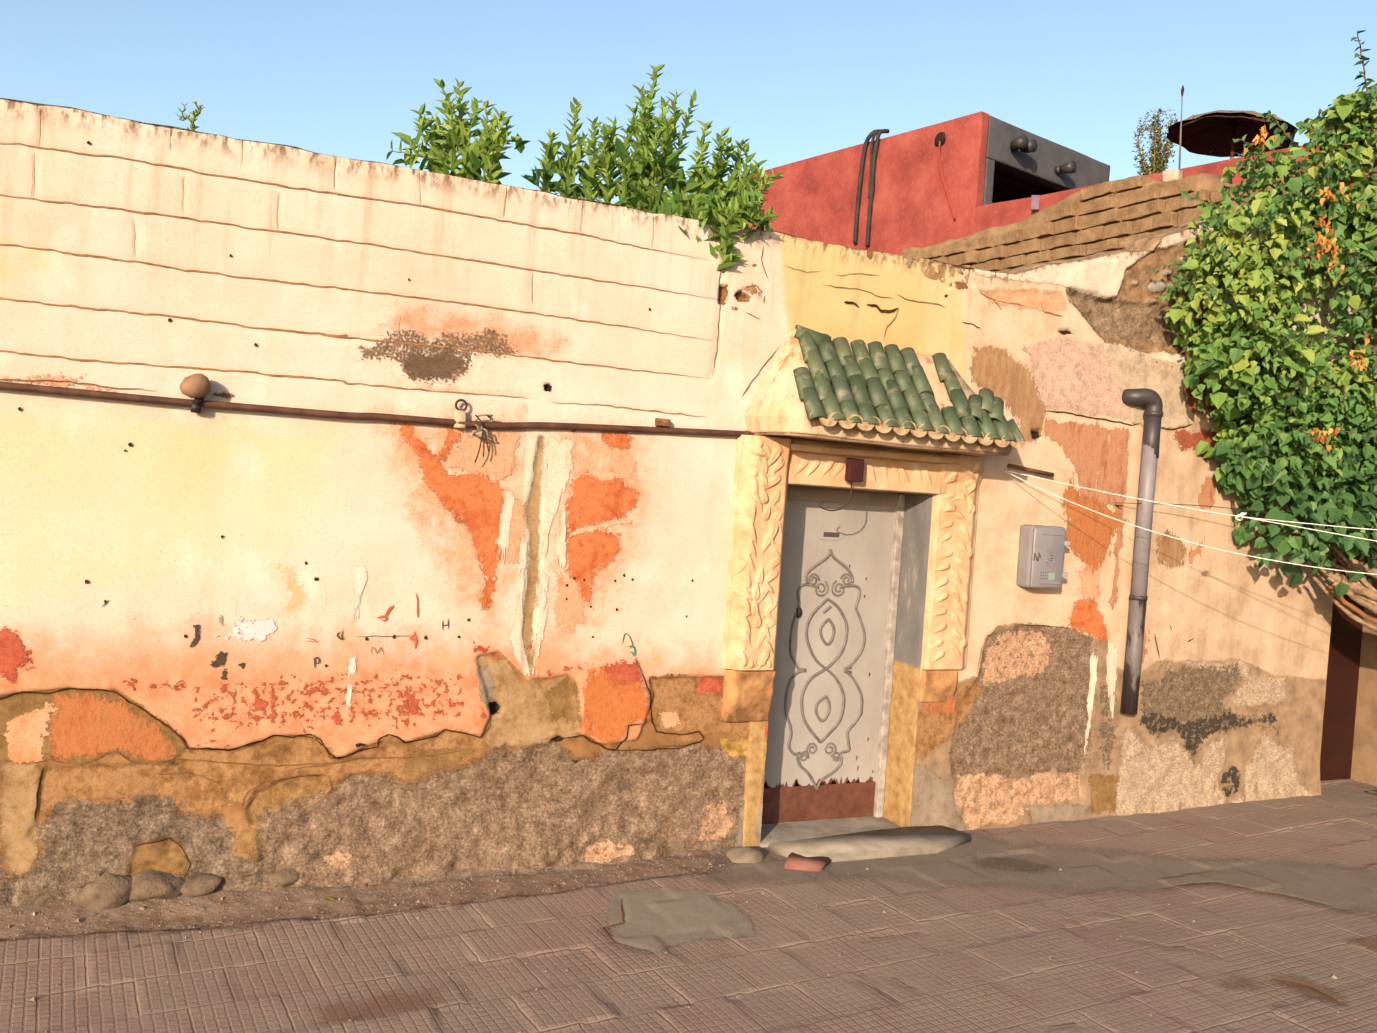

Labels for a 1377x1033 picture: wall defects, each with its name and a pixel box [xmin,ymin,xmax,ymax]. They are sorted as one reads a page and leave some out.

spalling [0,618,768,908]
spalling [915,622,1097,830]
spalling [1115,728,1313,816]
spalling [1142,629,1287,710]